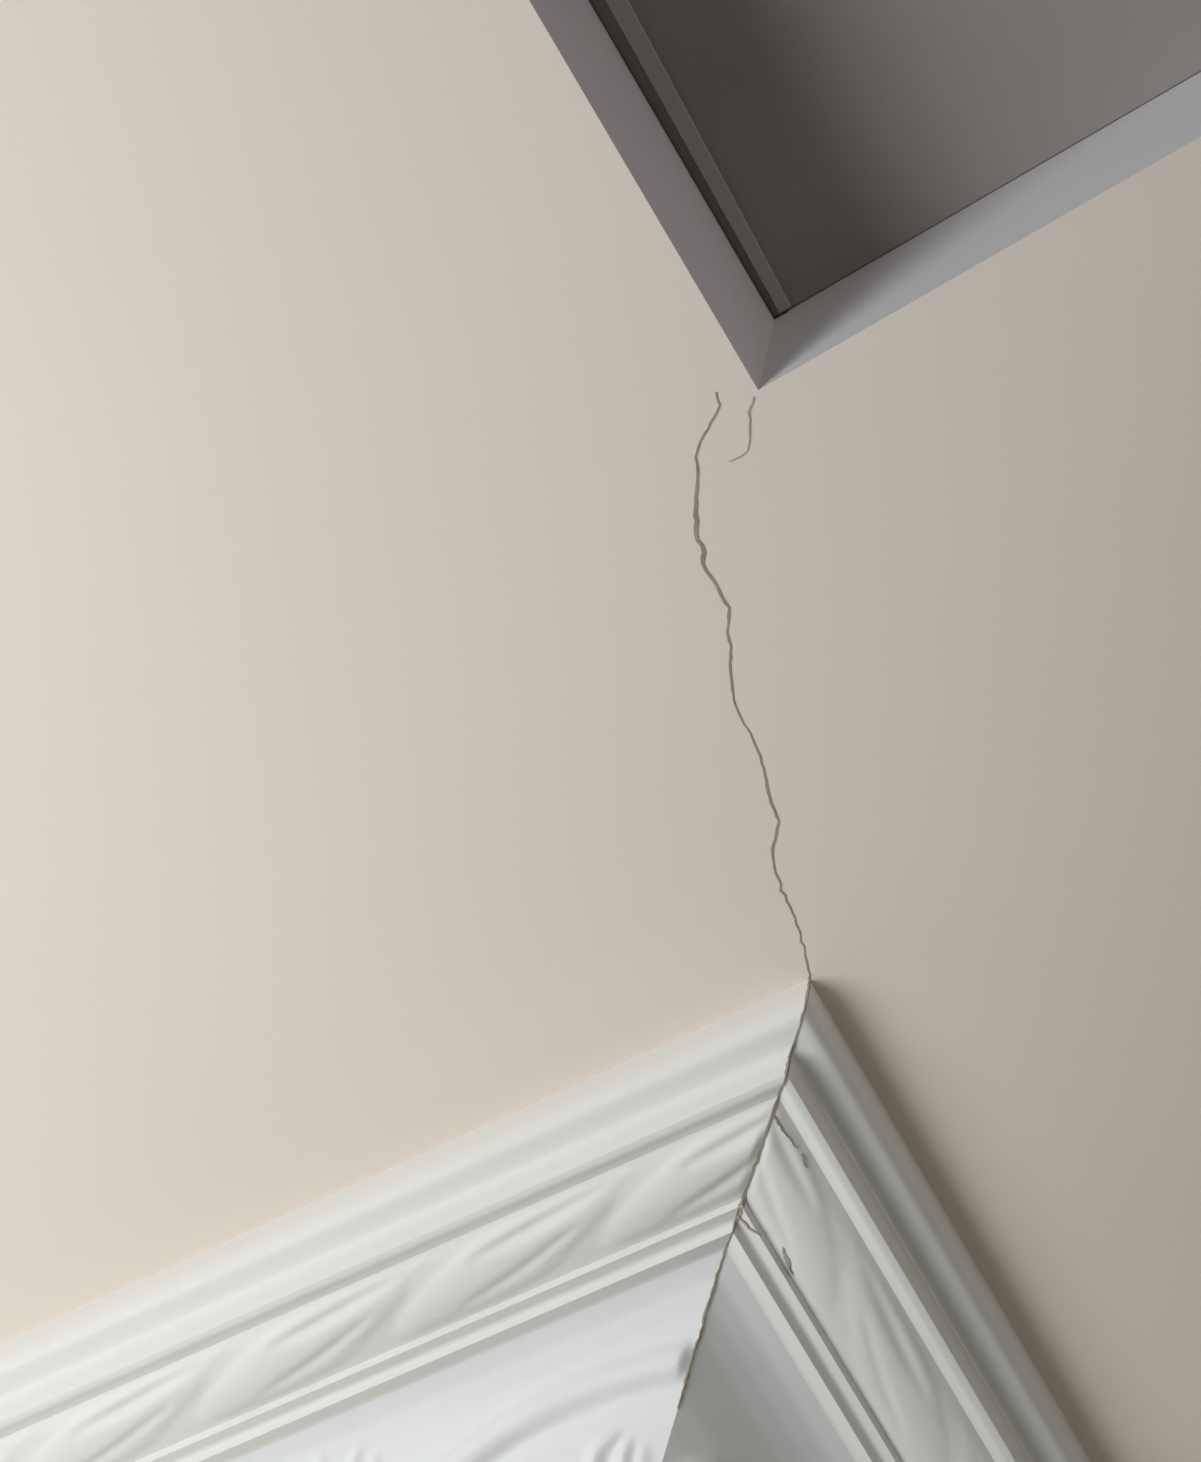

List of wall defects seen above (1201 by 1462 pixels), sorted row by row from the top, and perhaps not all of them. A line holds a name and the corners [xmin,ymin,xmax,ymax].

crack [677,392,811,1409]